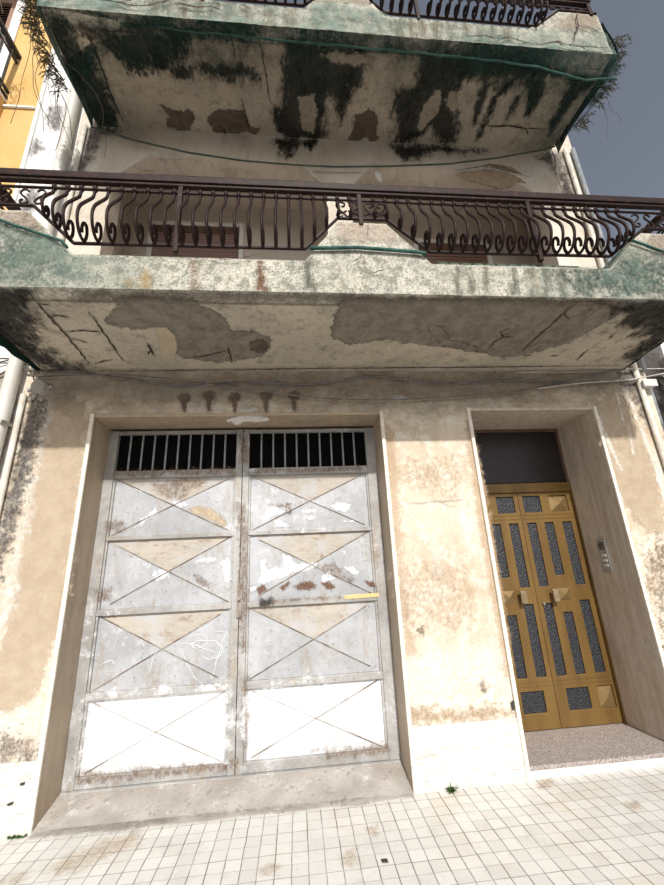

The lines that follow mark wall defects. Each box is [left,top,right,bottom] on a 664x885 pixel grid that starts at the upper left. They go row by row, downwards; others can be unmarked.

crack [464,12,613,50]
damp [45,0,261,171]
spalling [207,109,260,135]
damp [273,36,366,158]
crack [29,292,125,372]
spalling [104,297,271,363]
crack [147,305,588,371]
spalling [330,297,623,360]
damp [594,300,664,499]
damp [0,395,55,633]
corrosion [257,585,277,608]
corrosion [281,565,352,601]